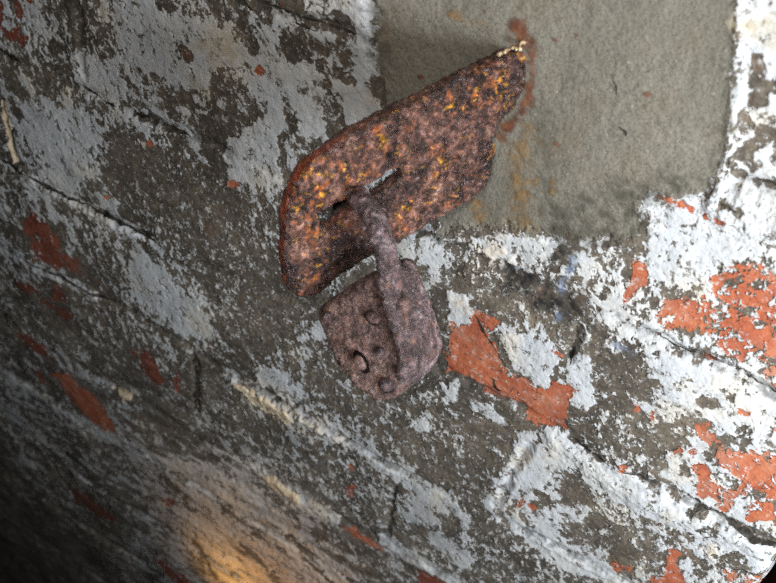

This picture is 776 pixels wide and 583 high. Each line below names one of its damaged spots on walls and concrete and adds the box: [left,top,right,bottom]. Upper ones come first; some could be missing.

flaking render [0,0,33,47]
peeling [51,0,124,81]
peeling [174,34,194,74]
peeling [222,0,376,93]
rust [496,19,536,142]
flaking render [659,197,724,226]
peeling [0,63,503,496]
peeling [441,260,776,523]
crack [660,335,776,392]
peeling [0,434,190,583]
peeling [259,473,300,508]
crack [574,438,657,484]